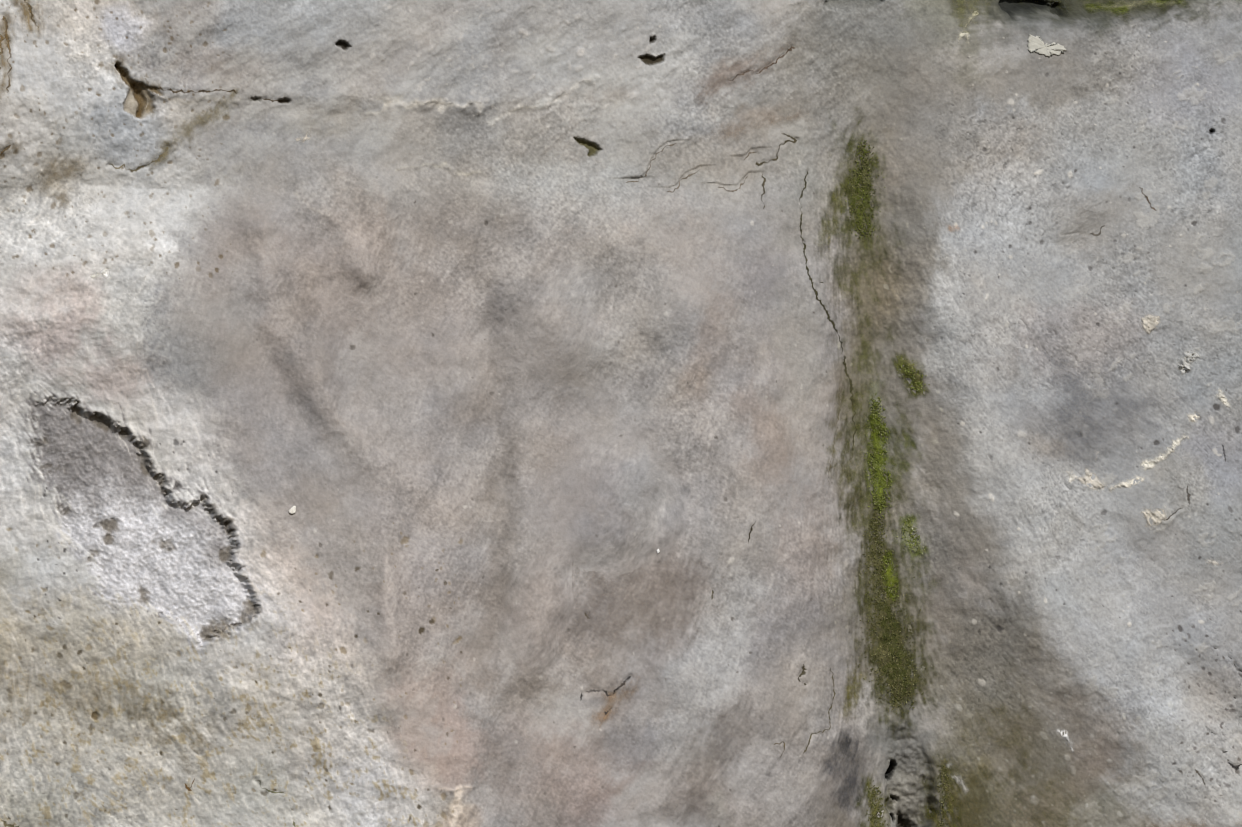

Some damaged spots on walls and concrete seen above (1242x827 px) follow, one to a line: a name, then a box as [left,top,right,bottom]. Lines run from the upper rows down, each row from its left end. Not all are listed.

crack [756,133,797,207]
crack [800,171,857,473]
spalling [31,399,261,644]
leakage [828,738,857,804]
crack [885,760,910,827]